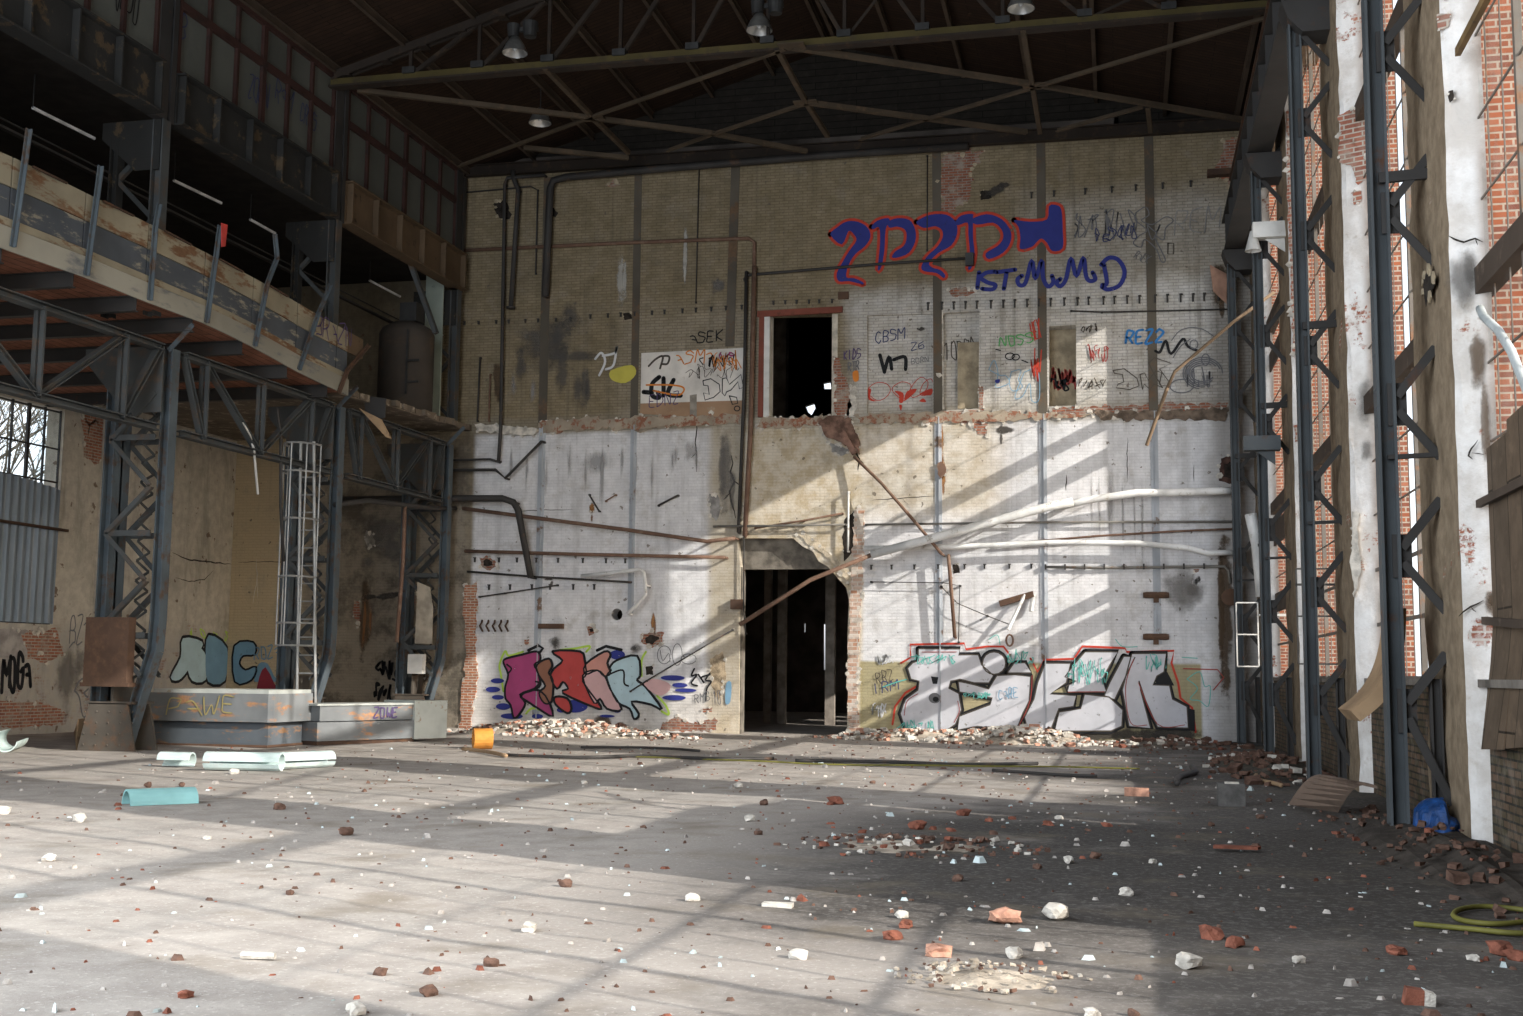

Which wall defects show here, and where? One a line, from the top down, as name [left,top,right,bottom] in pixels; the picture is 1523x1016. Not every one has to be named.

spalling [1335,106,1366,205]
spalling [80,414,103,465]
spalling [0,626,66,666]
spalling [458,555,500,728]
spalling [0,696,66,731]